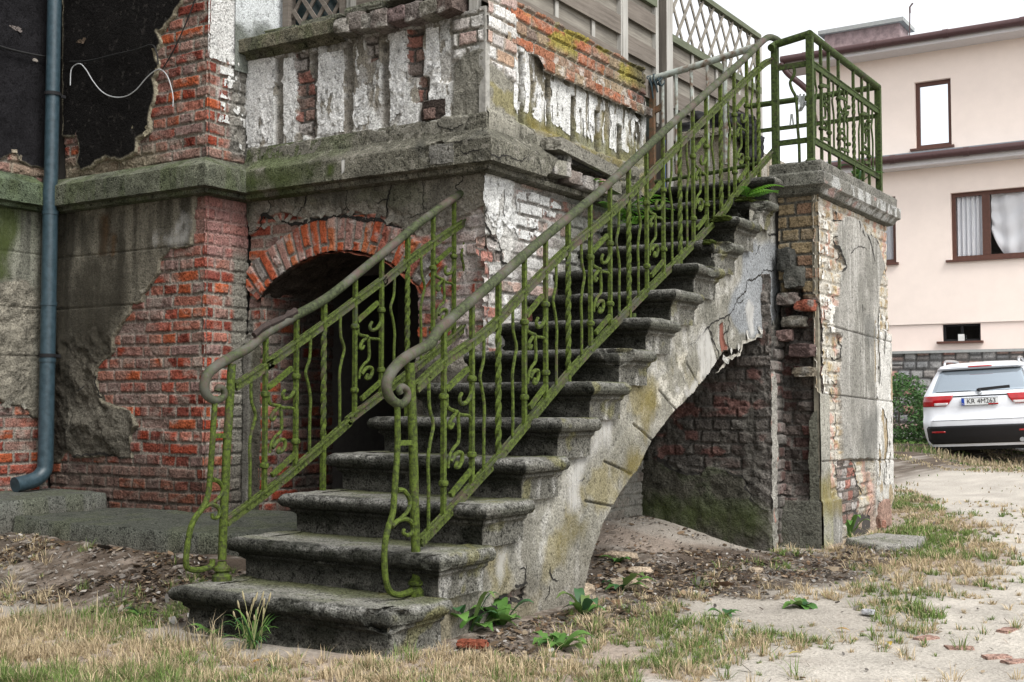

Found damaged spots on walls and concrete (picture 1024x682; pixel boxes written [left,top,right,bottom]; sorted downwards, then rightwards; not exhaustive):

flaking render [64,0,446,179]
flaking render [506,2,653,196]
peeling [475,176,561,262]
flaking render [0,399,38,491]
flaking render [30,195,210,513]
crack [690,233,781,355]
flaking render [835,460,860,524]
peeling [874,310,894,485]
spalling [876,498,892,528]